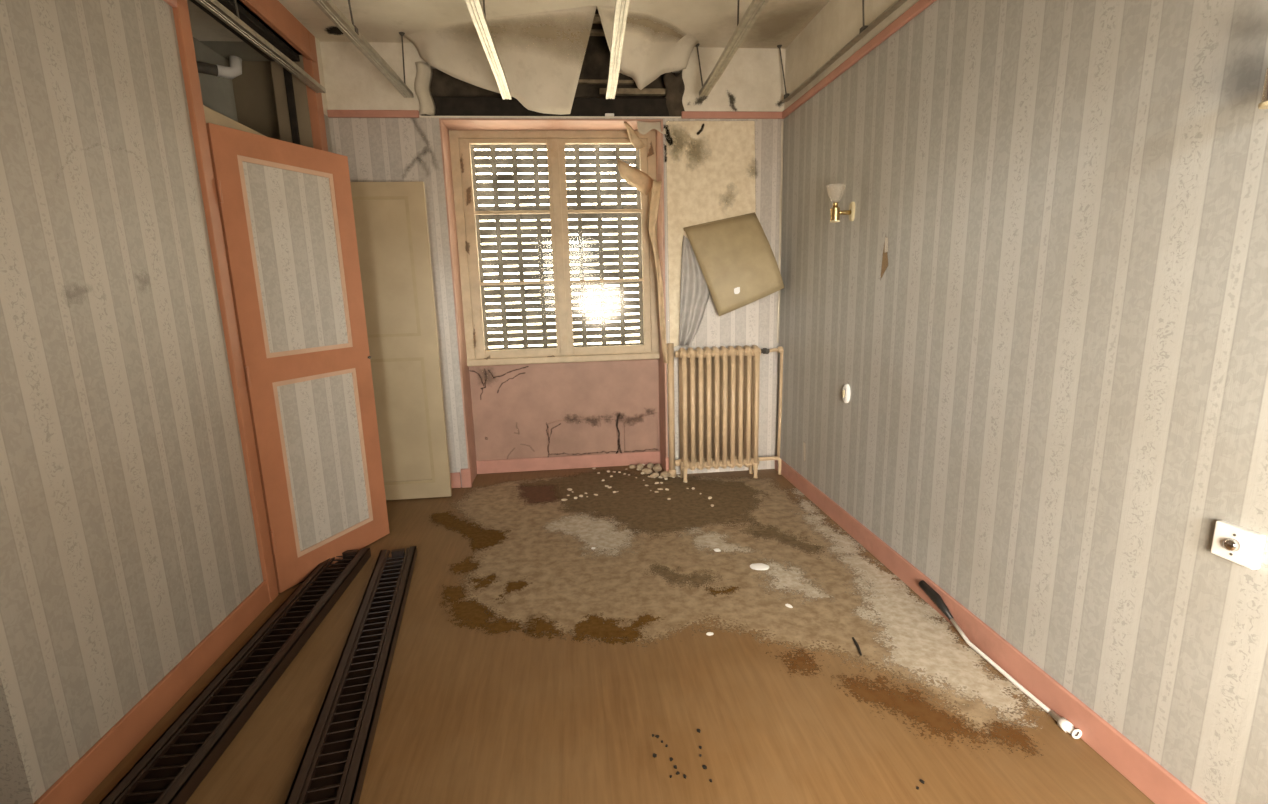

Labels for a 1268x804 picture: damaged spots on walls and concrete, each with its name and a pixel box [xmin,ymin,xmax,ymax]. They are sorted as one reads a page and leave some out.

spalling [414,61,436,116]
damp [663,125,701,162]
crack [470,366,529,398]
crack [546,413,657,457]